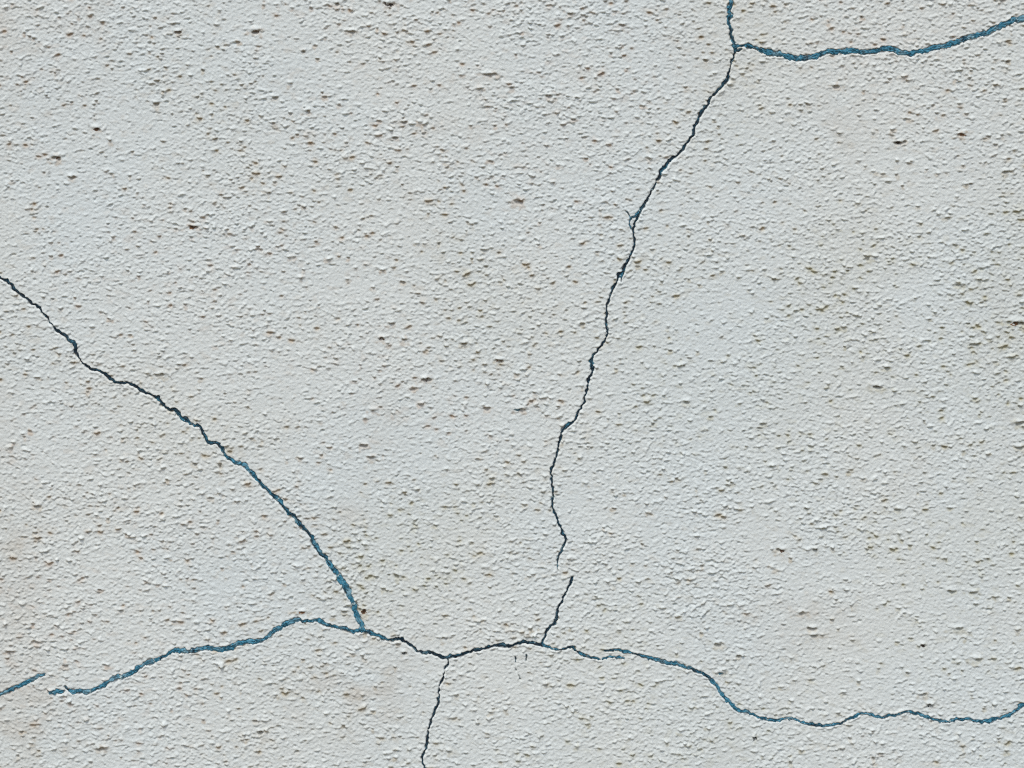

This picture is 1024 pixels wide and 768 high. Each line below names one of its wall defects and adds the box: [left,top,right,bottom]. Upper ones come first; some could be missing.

crack [0,276,1024,768]
crack [550,0,1024,568]